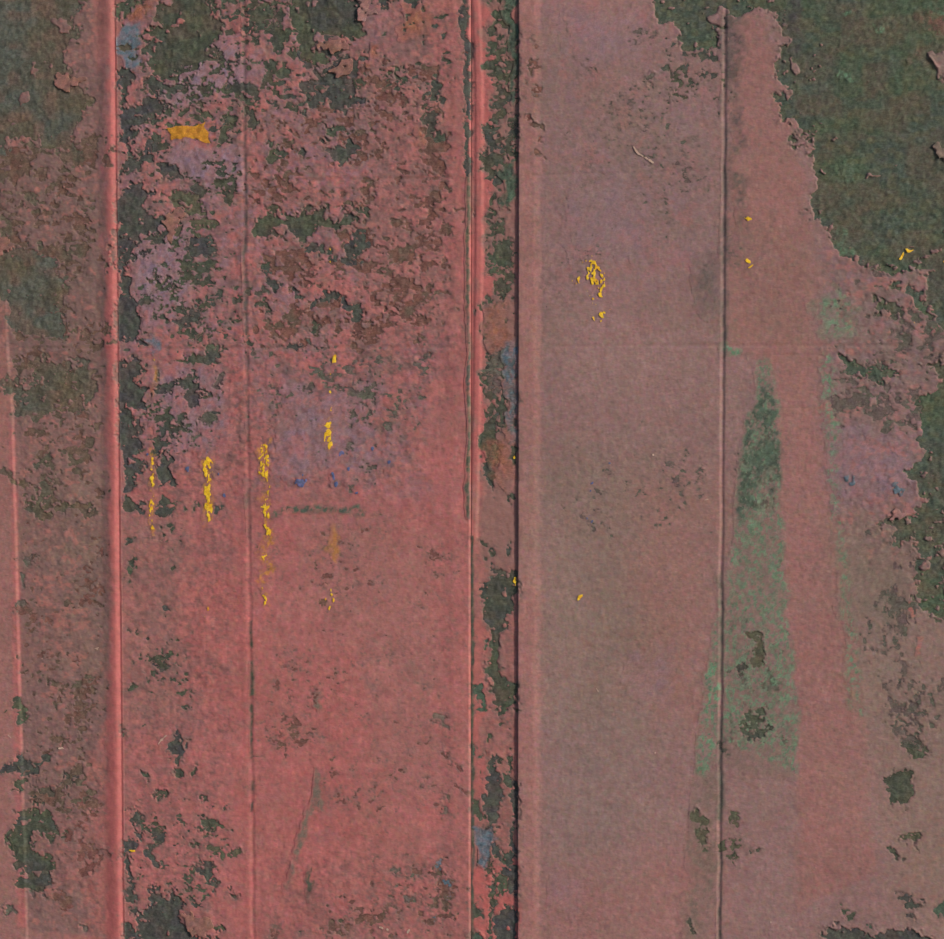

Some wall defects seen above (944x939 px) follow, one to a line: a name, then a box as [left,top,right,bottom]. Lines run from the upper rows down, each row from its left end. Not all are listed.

peeling [0,0,546,939]
peeling [585,0,944,811]
peeling [123,795,242,939]
peeling [320,854,470,939]
peeling [820,892,944,939]